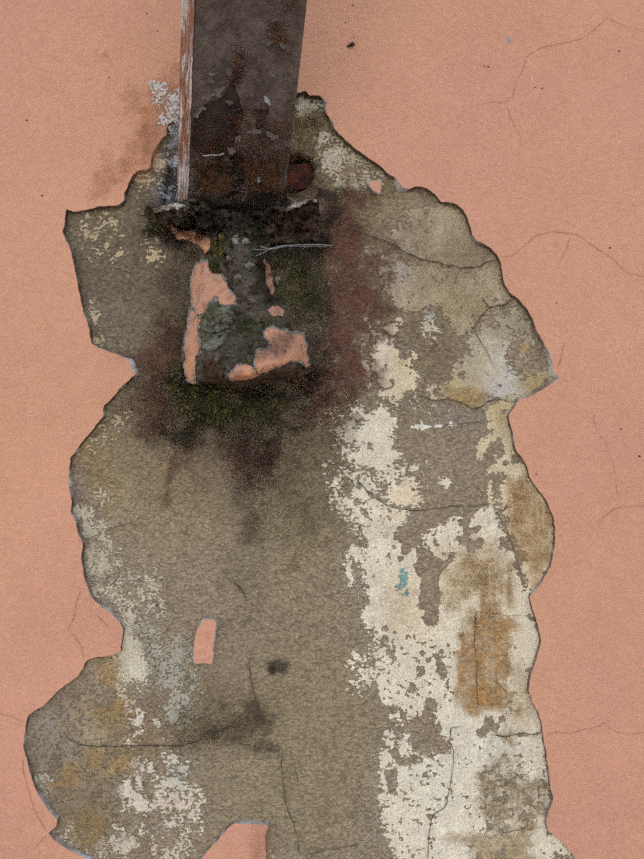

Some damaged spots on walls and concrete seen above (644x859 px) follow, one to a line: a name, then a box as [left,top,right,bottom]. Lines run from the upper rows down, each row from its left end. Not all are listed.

peeling [148,80,179,104]
leakage [258,186,396,411]
crack [344,228,639,276]
peeling [23,91,575,859]
rust [456,554,518,716]